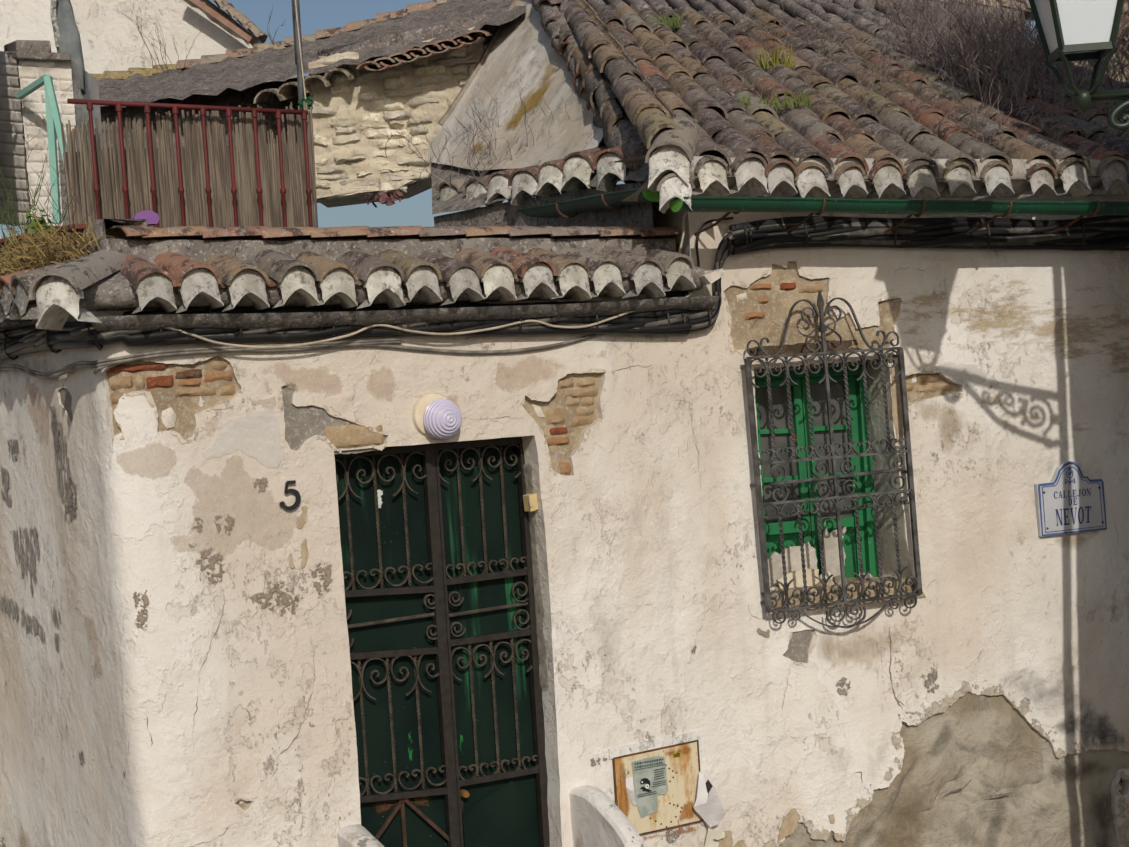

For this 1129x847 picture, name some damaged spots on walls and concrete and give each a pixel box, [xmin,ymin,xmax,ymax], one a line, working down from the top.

flaking render [724,260,901,363]
flaking render [50,385,73,453]
flaking render [102,353,244,444]
flaking render [278,383,387,454]
flaking render [520,369,606,477]
flaking render [891,362,986,443]
peeling [289,506,335,595]
peeling [250,581,303,620]
peeling [528,512,549,689]
flaking render [783,629,818,666]
rust [620,766,629,817]
rust [670,802,694,835]